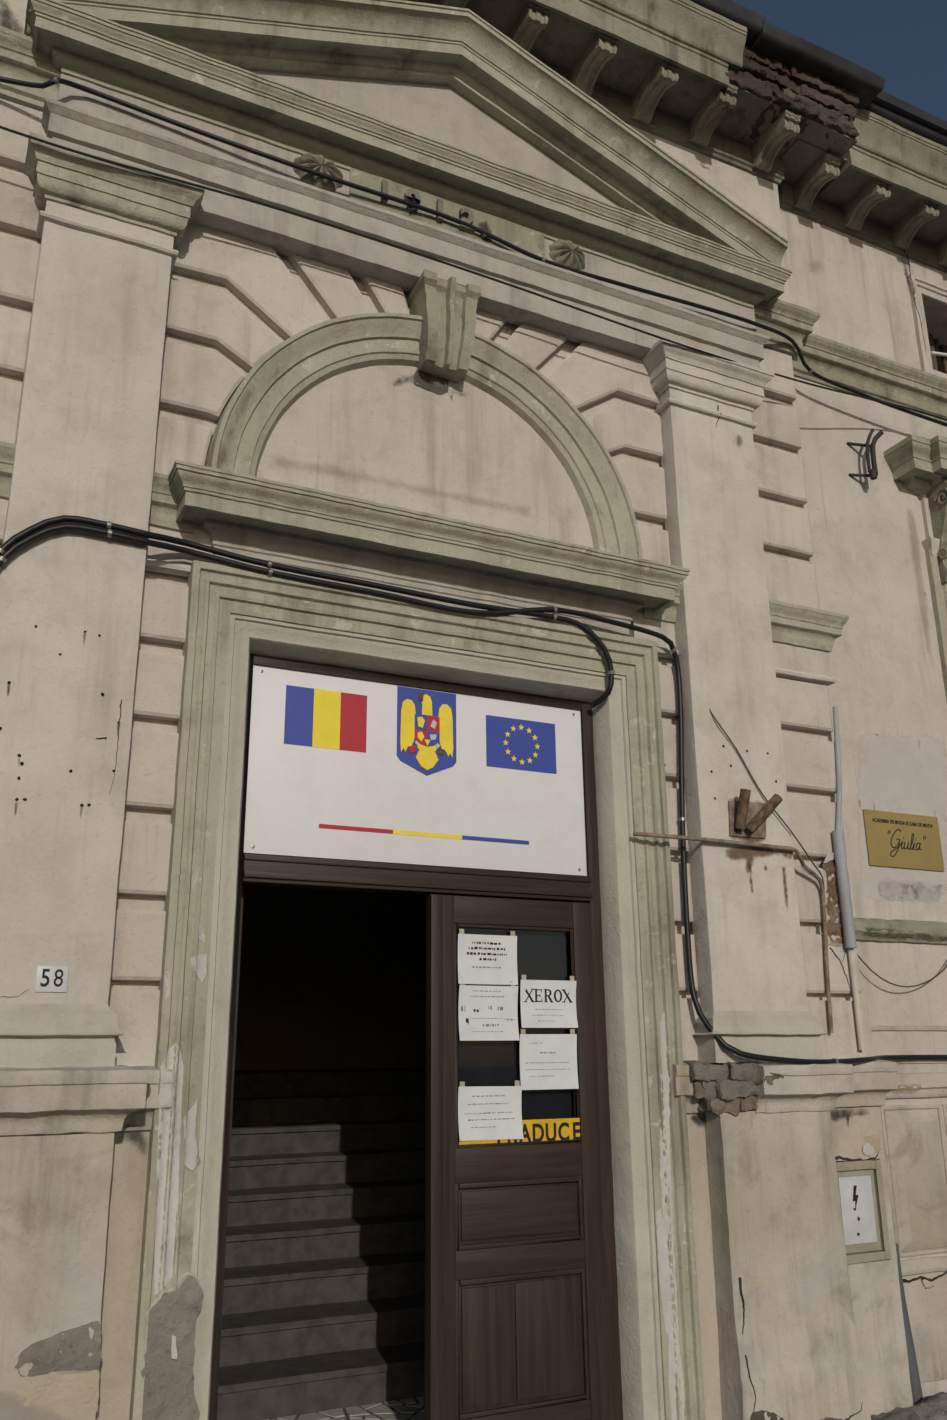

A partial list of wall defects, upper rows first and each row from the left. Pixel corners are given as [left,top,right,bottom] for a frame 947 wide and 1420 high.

spalling [725,46,859,153]
rust [728,836,792,904]
flaking render [141,1041,204,1420]
spalling [654,1009,784,1420]
crack [903,1271,947,1289]
flaking render [10,1321,102,1377]
crack [739,1277,756,1409]